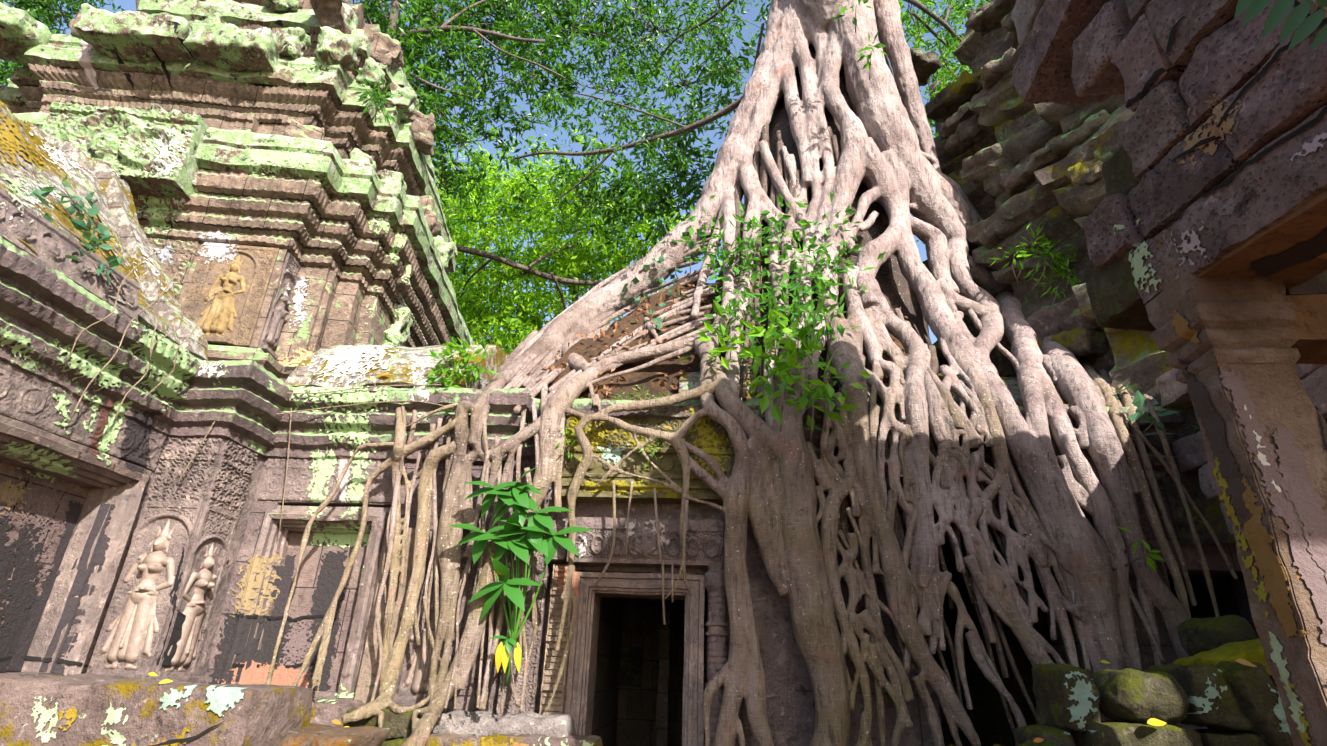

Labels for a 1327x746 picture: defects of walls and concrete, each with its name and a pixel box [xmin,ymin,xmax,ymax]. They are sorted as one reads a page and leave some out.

crack [1171,17,1327,161]
crack [1152,105,1327,237]
water stain [0,500,115,676]